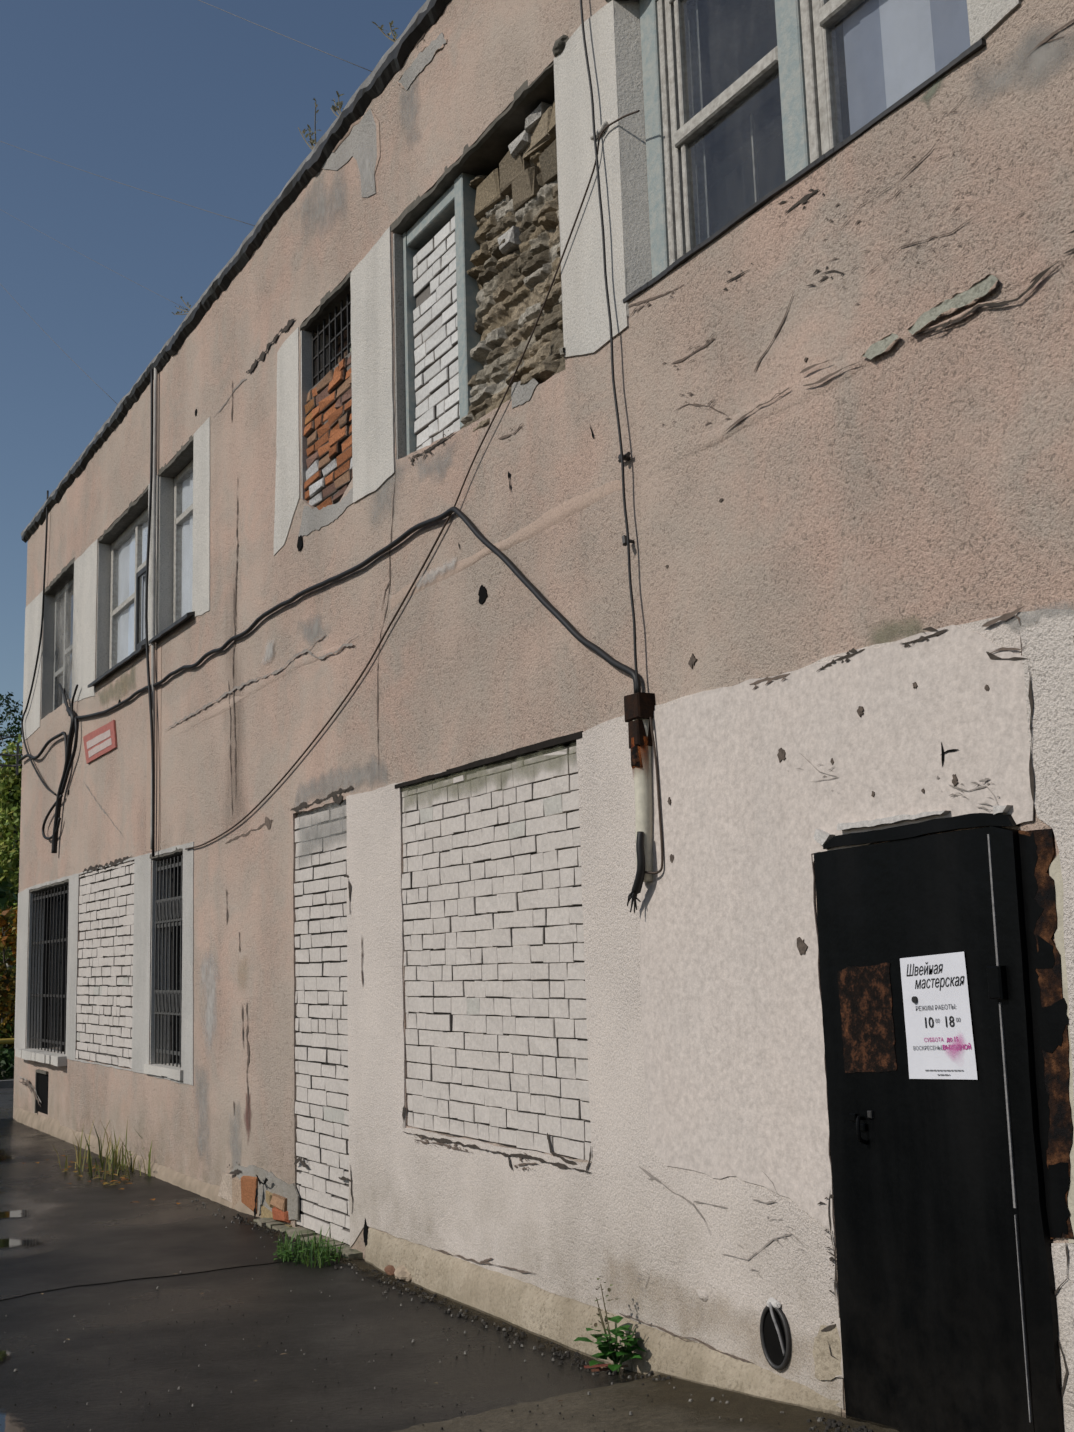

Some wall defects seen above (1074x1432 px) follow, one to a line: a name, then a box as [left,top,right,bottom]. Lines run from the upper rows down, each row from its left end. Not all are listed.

peeling [321,108,380,197]
spalling [460,143,566,432]
peeling [861,273,999,360]
crack [908,230,1074,338]
crack [724,292,861,432]
spalling [817,648,864,671]
rust [1011,829,1063,1007]
crack [402,1107,591,1173]
rust [1041,1024,1074,1239]
spalling [218,1165,299,1227]
crack [619,1313,755,1364]
crack [821,1322,838,1360]